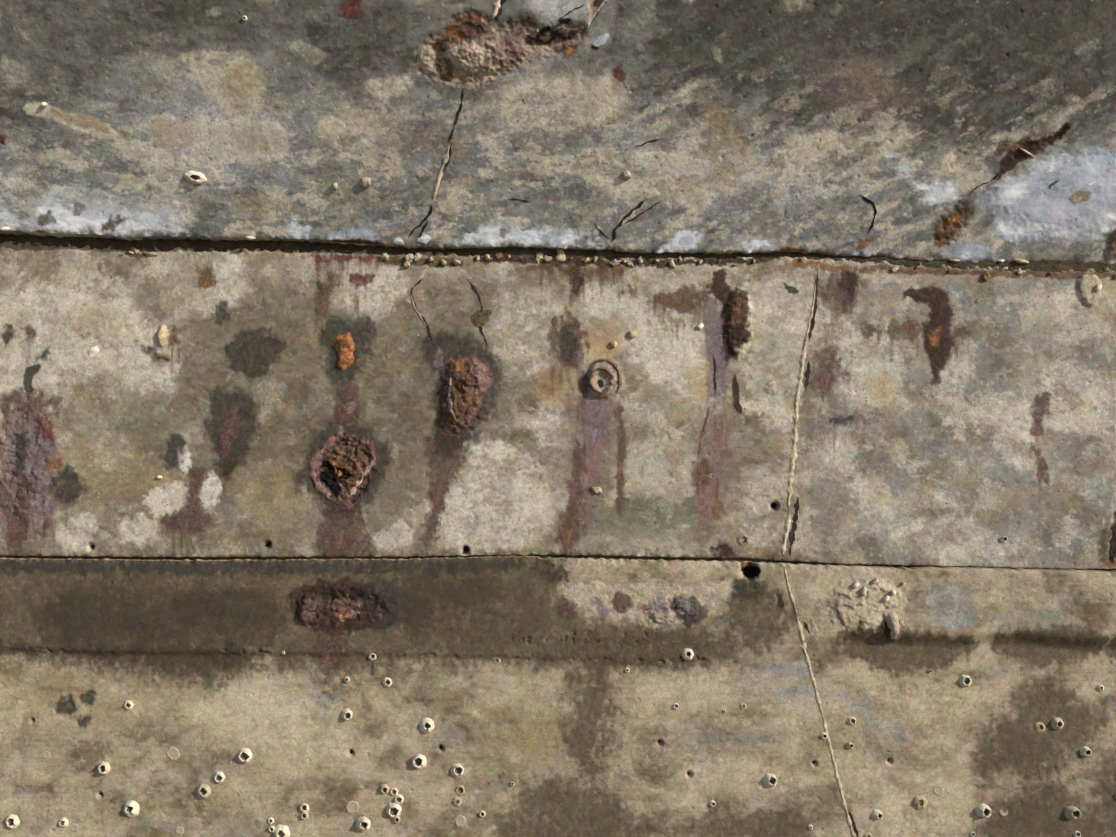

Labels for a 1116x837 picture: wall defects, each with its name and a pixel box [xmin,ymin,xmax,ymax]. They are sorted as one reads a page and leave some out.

crack [492,0,506,21]
spalling [415,0,609,90]
crack [408,90,464,238]
efflorescence [984,147,1116,244]
efflorescence [942,242,1029,264]
rust [332,332,356,370]
rust [862,286,970,383]
rust [653,269,752,538]
water stain [0,325,810,837]
crack [776,266,859,837]
crack [1099,512,1116,568]